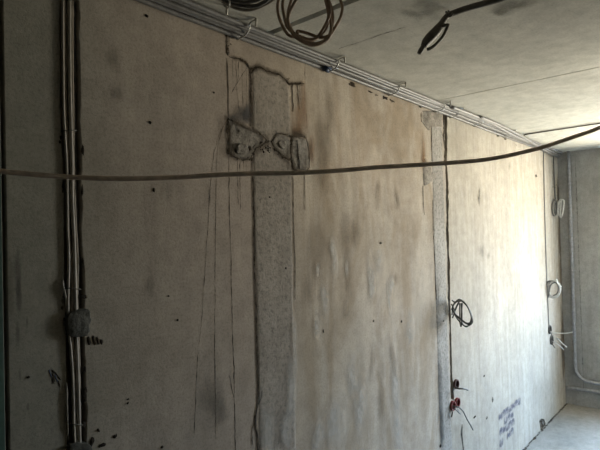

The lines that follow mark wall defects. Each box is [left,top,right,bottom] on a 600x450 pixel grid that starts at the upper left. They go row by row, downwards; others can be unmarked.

crack [196,295,216,378]
crack [204,35,307,450]